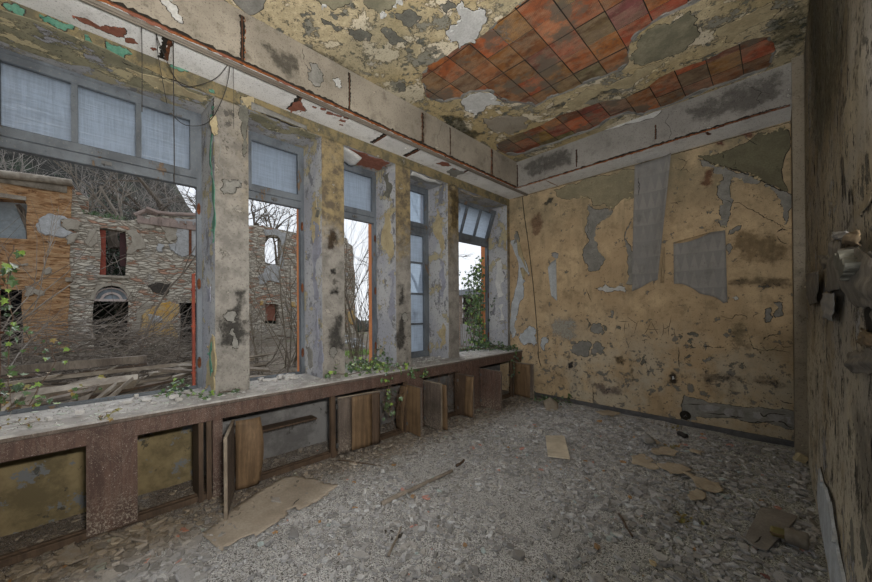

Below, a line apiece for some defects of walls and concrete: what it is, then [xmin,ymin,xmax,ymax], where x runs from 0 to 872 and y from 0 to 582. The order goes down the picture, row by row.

peeling [0,9,242,243]
peeling [159,0,184,24]
peeling [317,0,422,45]
flaking render [421,0,701,116]
flaking render [491,37,777,175]
flaking render [698,125,792,255]
peeling [850,517,868,570]